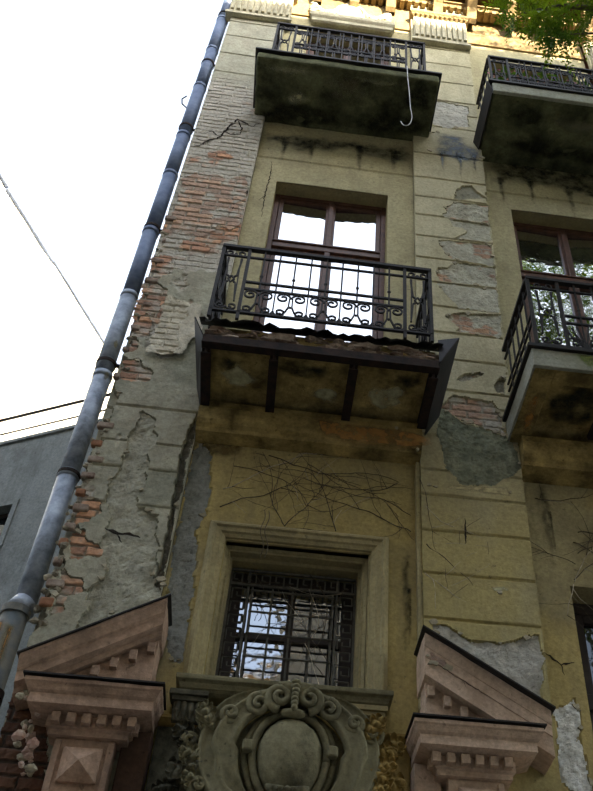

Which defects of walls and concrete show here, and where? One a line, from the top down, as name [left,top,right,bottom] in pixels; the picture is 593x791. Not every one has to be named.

crack [190,119,259,147]
water stain [264,96,336,126]
water stain [269,136,407,163]
mould [357,114,423,134]
spalling [432,102,469,130]
water stain [494,163,593,207]
spalling [436,187,500,313]
flaking render [113,172,249,397]
spalling [28,409,213,664]
spalling [426,618,545,697]
spalling [553,699,593,791]